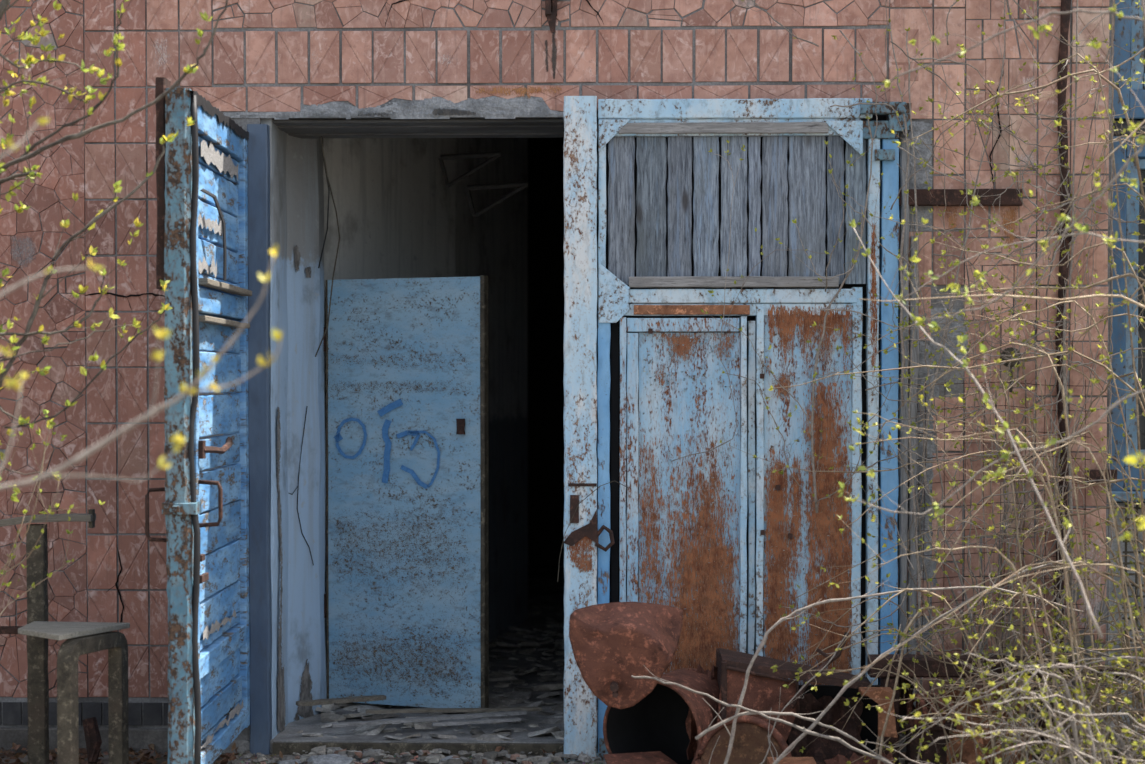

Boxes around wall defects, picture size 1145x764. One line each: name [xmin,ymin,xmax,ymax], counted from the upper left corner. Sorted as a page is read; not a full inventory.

spalling [223,95,564,120]
corrosion [643,332,736,388]
corrosion [638,434,740,673]
corrosion [763,304,853,673]